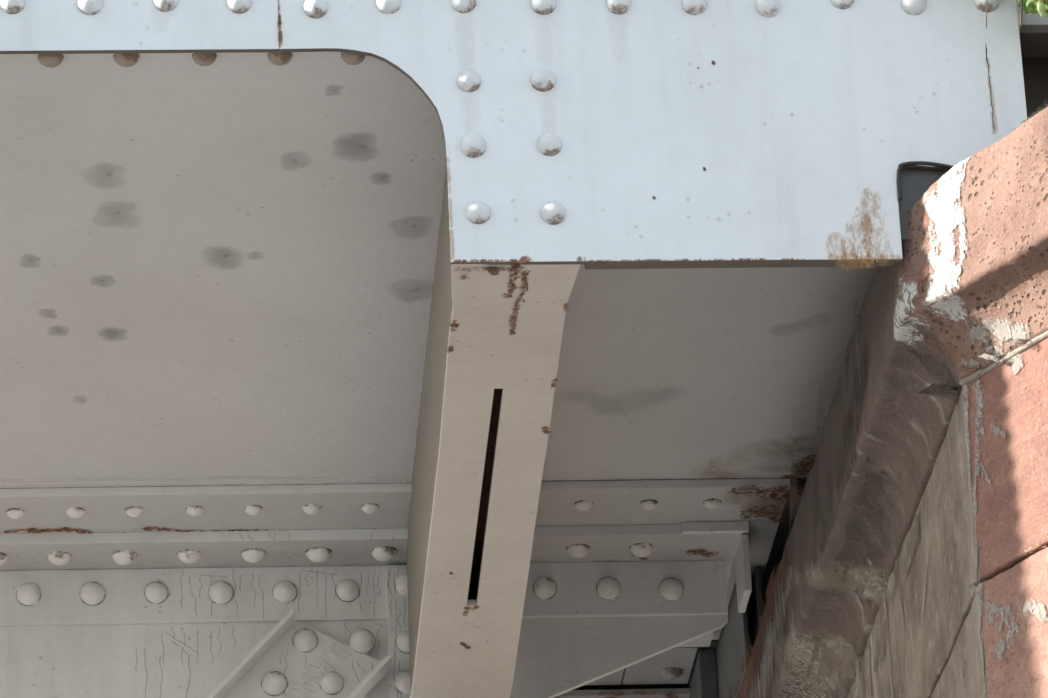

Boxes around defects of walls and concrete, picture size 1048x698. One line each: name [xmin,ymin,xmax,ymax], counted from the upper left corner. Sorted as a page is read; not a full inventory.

rust [453,256,534,335]
rust [730,455,816,524]
damp [893,158,1047,694]
crack [135,569,264,697]
crack [298,569,406,698]